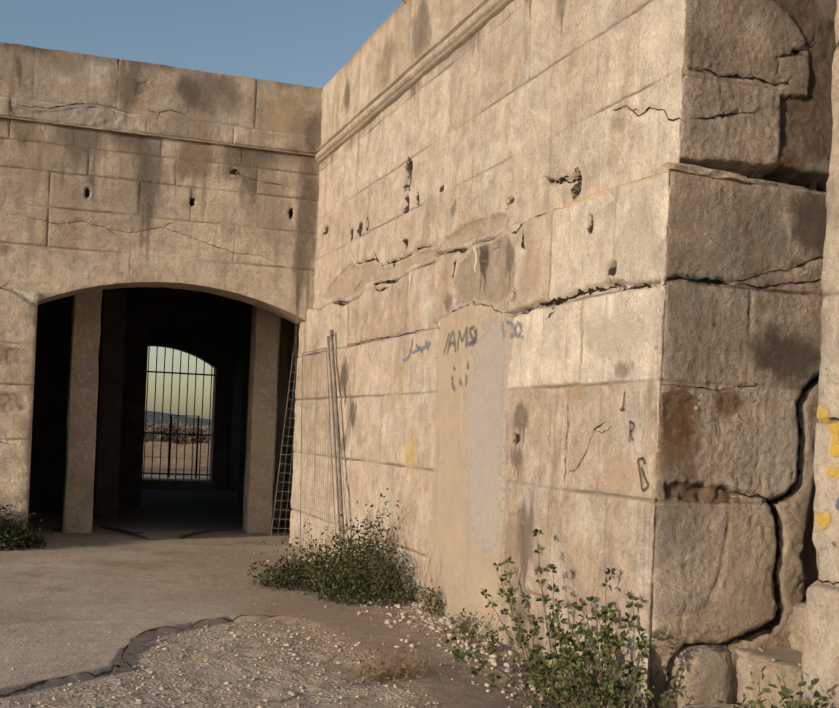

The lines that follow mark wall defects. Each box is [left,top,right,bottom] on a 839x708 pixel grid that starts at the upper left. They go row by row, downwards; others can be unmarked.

crack [692,41,839,86]
crack [17,103,180,119]
crack [611,105,760,122]
crack [319,204,548,311]
crack [347,256,823,346]
water stain [749,315,817,380]
water stain [514,403,527,435]
crack [564,401,610,477]
rust [658,392,696,466]
crack [663,375,839,685]